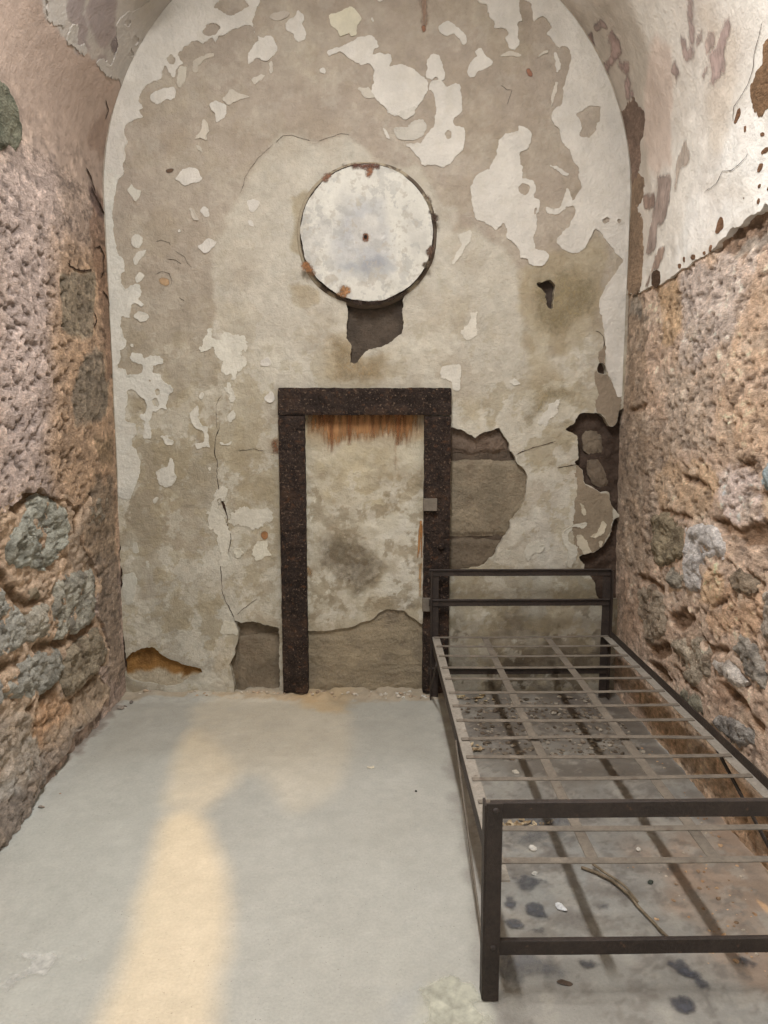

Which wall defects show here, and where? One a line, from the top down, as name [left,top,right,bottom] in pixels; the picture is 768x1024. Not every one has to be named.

rust [300,163,438,305]
spalling [0,0,280,851]
rust [311,415,418,445]
spalling [327,0,768,798]
crack [214,399,262,617]
spalling [308,609,423,690]
spalling [721,816,768,871]